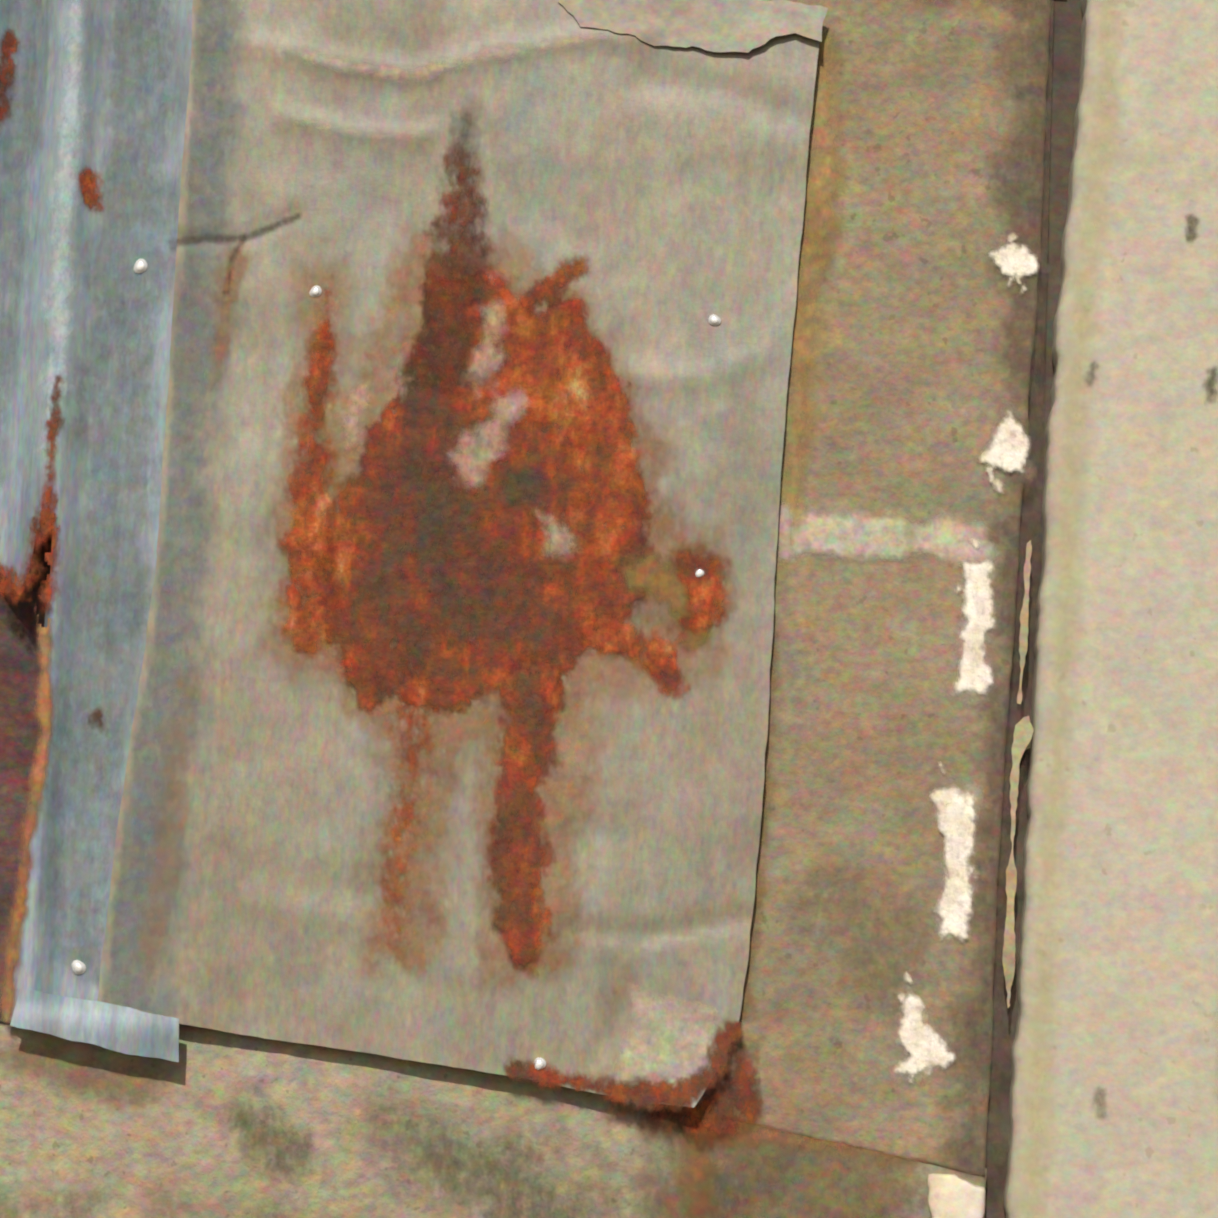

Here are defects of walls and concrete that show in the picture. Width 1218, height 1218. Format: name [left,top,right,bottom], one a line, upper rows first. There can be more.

rust [0,30,19,121]
rust [779,31,841,526]
peeling [991,235,1039,290]
peeling [981,404,1030,491]
rust [278,118,726,980]
rust [0,376,62,1022]
peeling [952,562,1003,703]
peeling [931,785,982,940]
rust [505,981,847,1179]
peeling [892,973,954,1081]